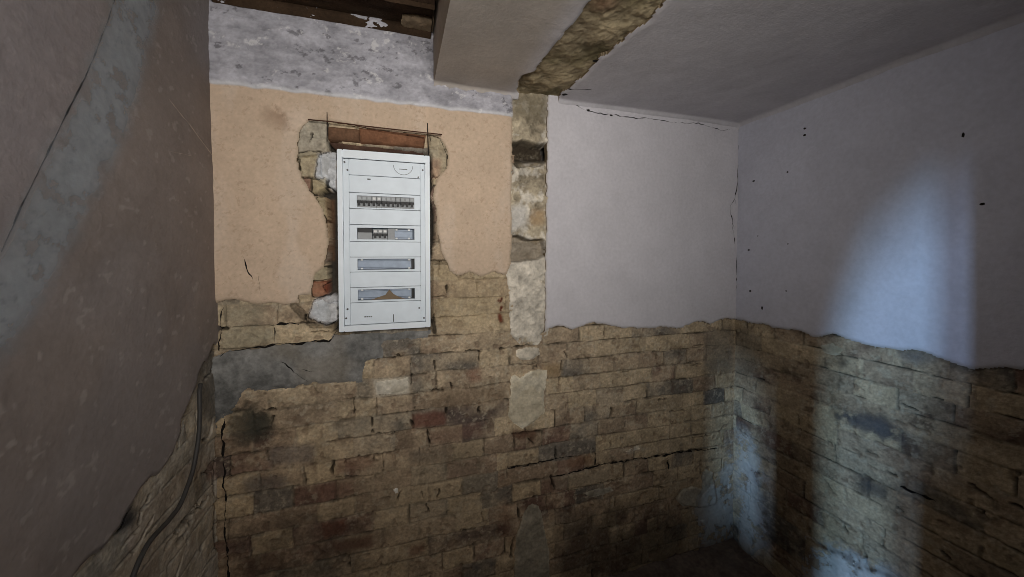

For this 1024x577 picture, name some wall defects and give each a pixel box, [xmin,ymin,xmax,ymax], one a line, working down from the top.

crack [571,89,730,131]
spalling [73,121,1024,577]
water stain [838,413,894,438]
crack [508,448,717,477]
crack [221,419,232,577]